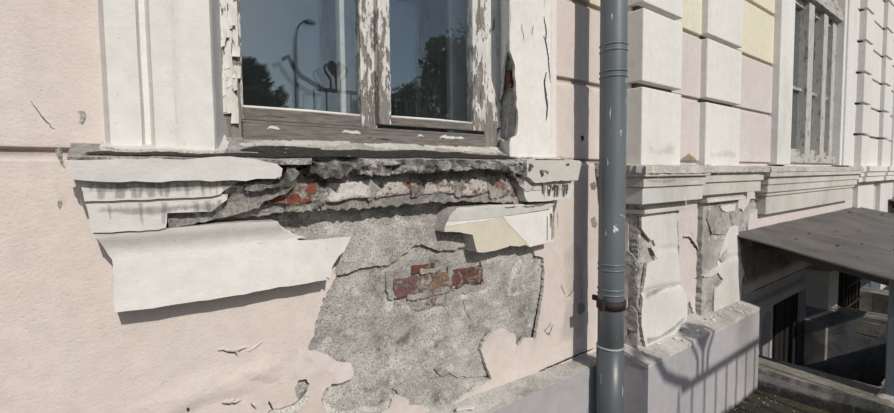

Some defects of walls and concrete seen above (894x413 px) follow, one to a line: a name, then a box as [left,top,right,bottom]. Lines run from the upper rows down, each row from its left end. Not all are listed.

peeling [219,0,241,124]
flaking render [166,39,549,413]
flaking render [605,204,658,350]
flaking render [687,199,756,316]